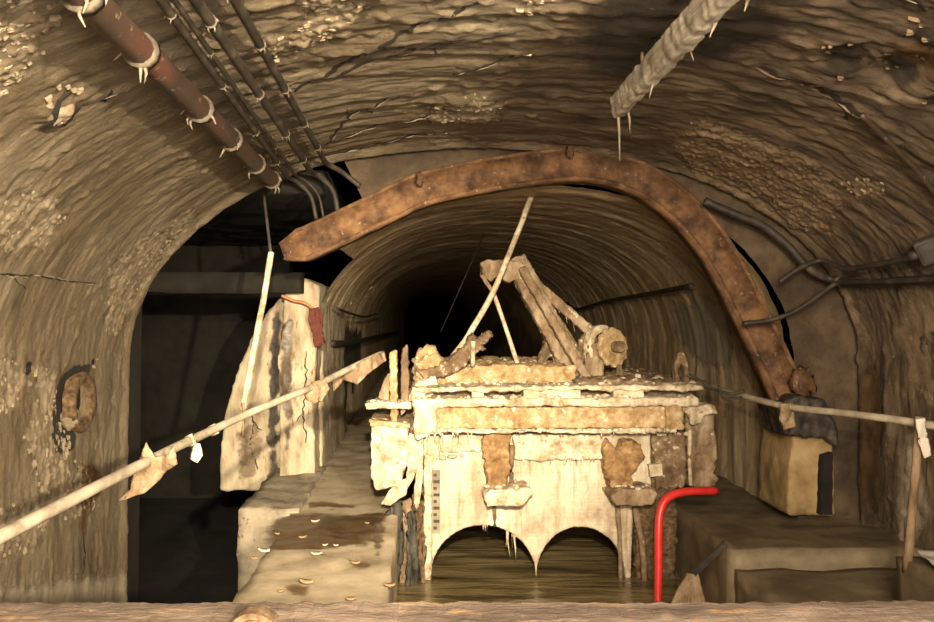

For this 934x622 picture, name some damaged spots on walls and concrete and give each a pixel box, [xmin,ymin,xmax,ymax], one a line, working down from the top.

damp [577,0,672,77]
damp [692,0,787,58]
damp [266,313,293,477]